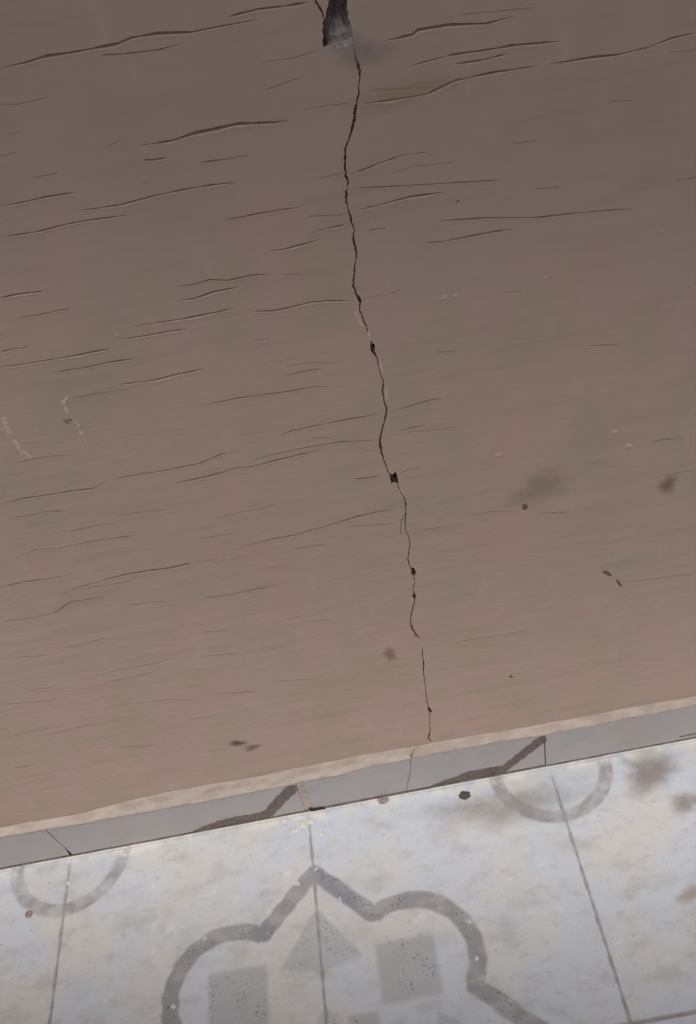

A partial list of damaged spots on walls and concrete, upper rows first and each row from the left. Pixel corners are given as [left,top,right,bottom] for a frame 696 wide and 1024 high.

crack [343,40,432,792]